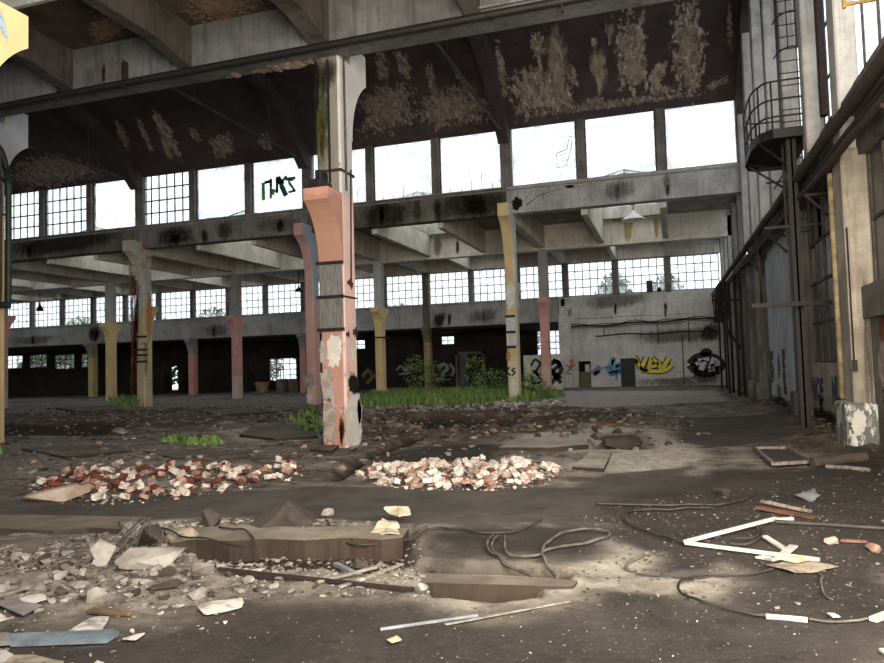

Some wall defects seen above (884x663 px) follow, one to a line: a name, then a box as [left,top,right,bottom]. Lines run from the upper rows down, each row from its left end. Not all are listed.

peeling [355,49,493,142]
peeling [494,0,732,123]
peeling [10,151,113,192]
water stain [365,201,421,227]
water stain [434,193,503,221]
rust [128,260,152,392]
peeling [304,334,363,446]
peeling [851,408,873,437]